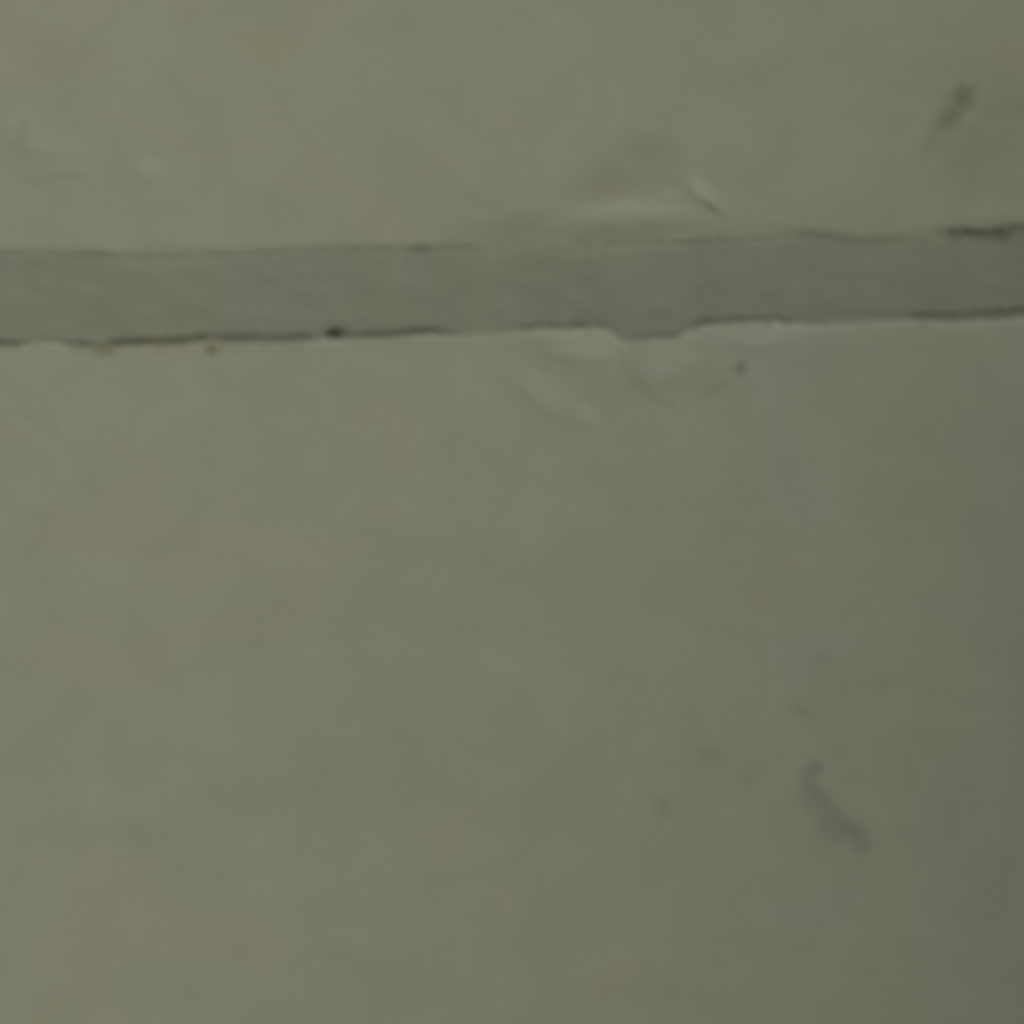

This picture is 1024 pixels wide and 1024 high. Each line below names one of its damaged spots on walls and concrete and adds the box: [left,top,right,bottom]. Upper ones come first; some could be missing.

crack [939,222,1024,246]
crack [58,324,454,358]
crack [512,317,610,335]
crack [633,300,1024,342]